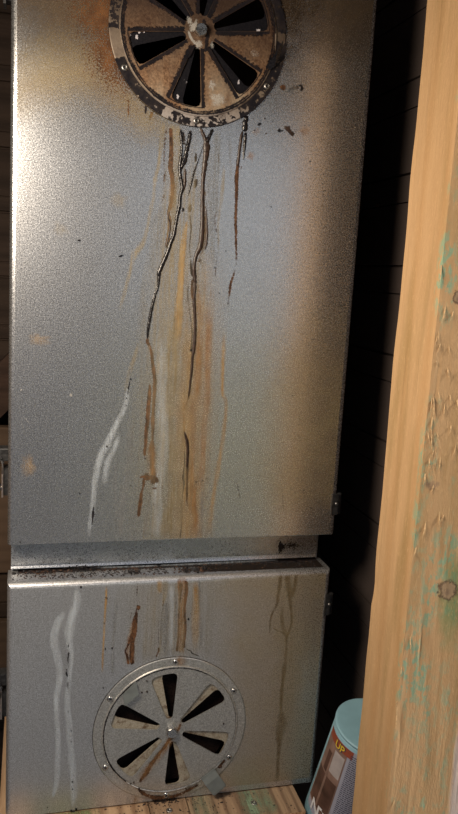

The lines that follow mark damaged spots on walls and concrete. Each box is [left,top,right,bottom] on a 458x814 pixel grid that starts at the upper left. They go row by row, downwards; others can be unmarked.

rust [57,0,153,120]
rust [165,127,180,248]
rust [175,224,187,338]
rust [137,333,163,517]
rust [92,580,224,803]